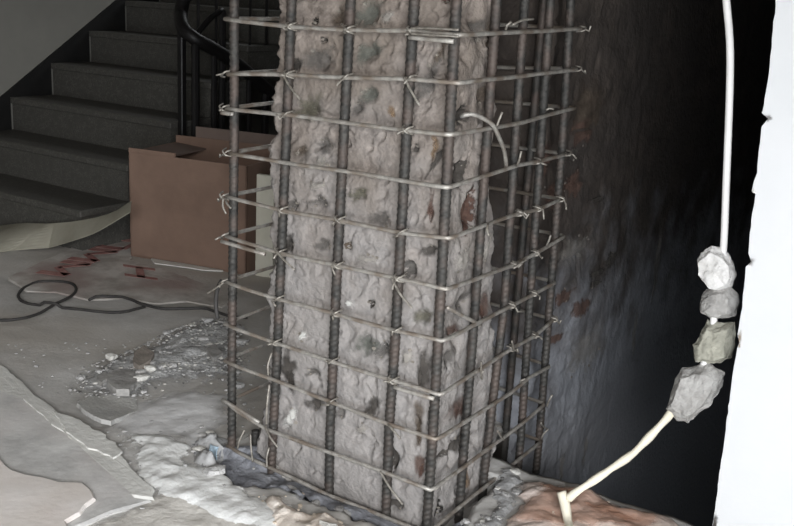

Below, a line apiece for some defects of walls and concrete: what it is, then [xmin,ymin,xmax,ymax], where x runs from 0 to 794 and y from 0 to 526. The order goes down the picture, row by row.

spalling [415,43,445,102]
spalling [296,101,319,122]
spalling [454,104,469,137]
spalling [425,149,443,178]
spalling [452,160,467,184]
spalling [460,185,477,237]
spalling [404,260,417,278]
spalling [356,337,390,359]
spalling [284,407,298,427]
spalling [305,398,323,411]
spalling [364,395,379,418]
spalling [448,435,460,452]